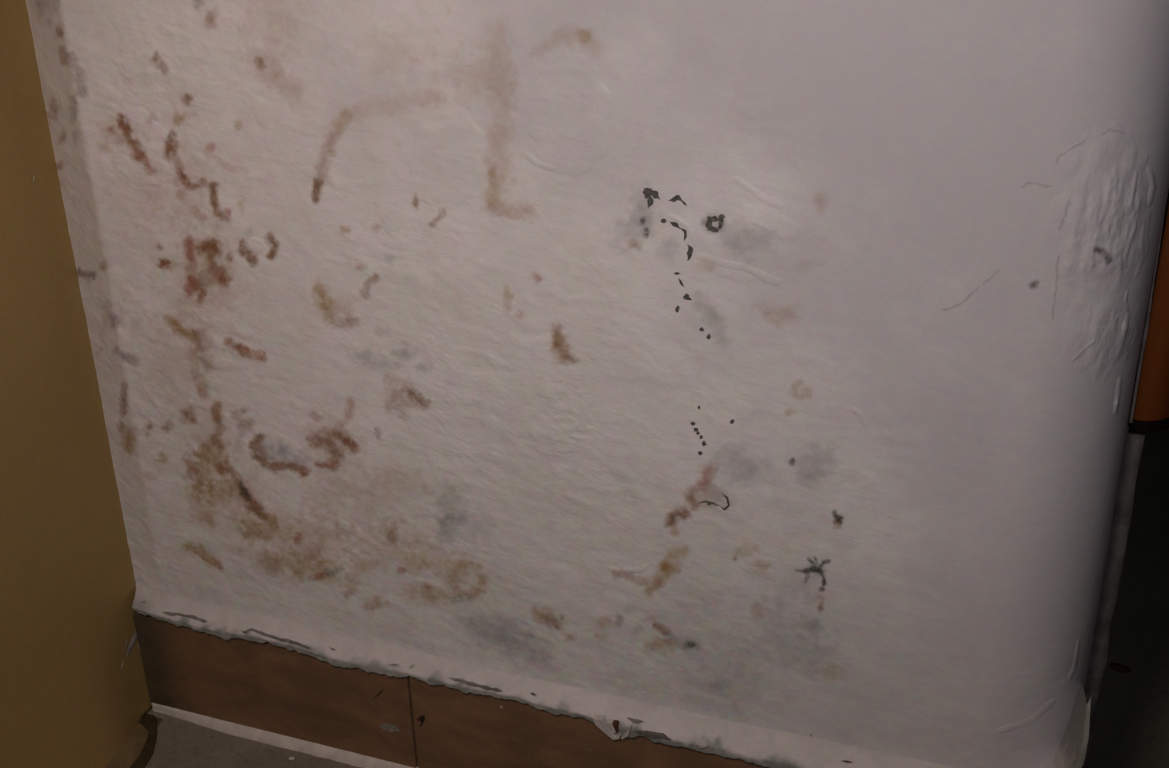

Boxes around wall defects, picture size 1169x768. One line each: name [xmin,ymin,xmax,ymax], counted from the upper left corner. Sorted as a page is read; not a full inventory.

damp [312,179,322,202]
damp [803,558,829,590]
flaking render [593,714,672,740]